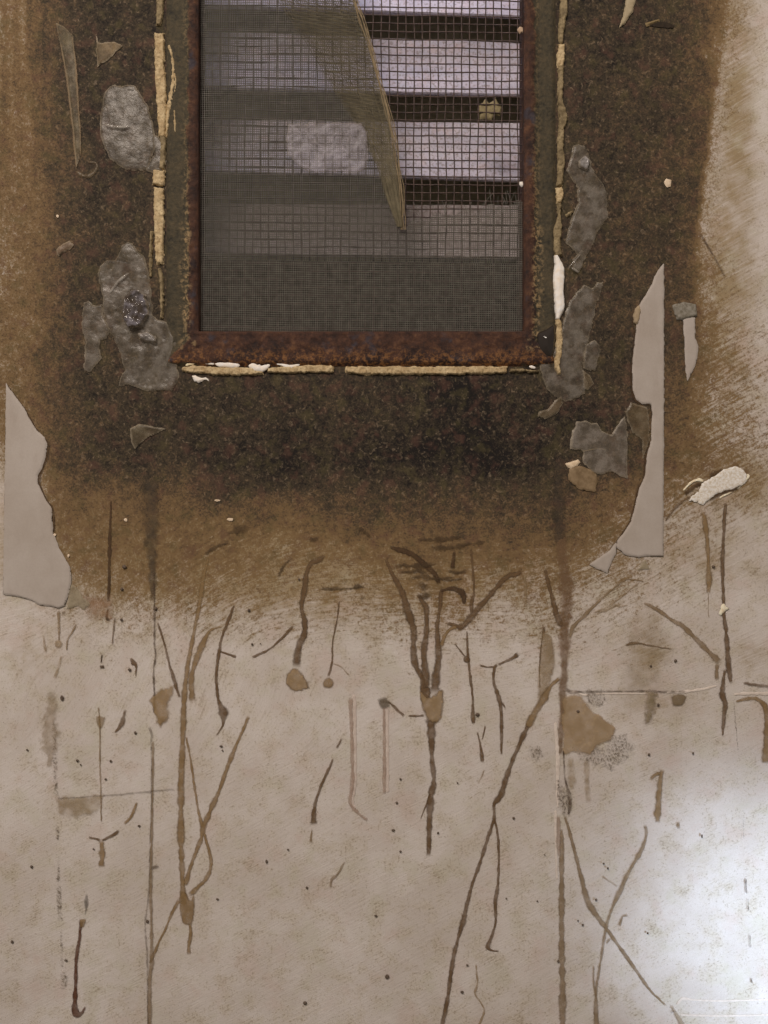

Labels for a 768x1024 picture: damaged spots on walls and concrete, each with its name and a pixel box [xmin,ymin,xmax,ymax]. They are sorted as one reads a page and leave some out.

peeling [3,383,90,609]
peeling [590,264,750,573]
water stain [562,695,615,754]